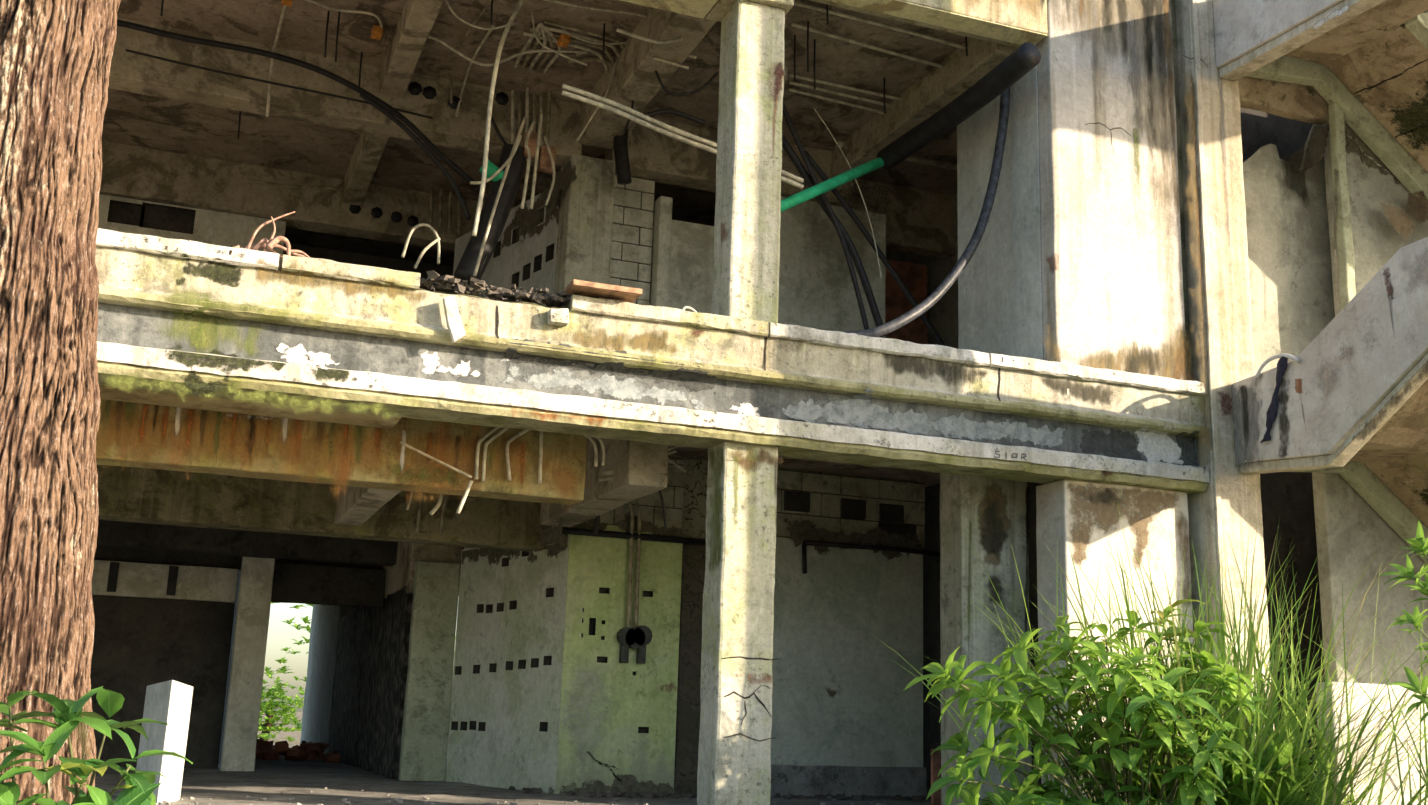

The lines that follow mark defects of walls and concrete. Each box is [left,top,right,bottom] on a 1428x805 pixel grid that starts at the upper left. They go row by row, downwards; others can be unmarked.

water stain [1066,0,1203,304]
peeling [276,343,339,369]
peeling [417,349,480,377]
water stain [1043,347,1112,404]
water stain [1080,328,1194,381]
rust [97,400,579,493]
water stain [968,483,1030,632]
water stain [1068,484,1193,605]
crack [722,656,779,742]